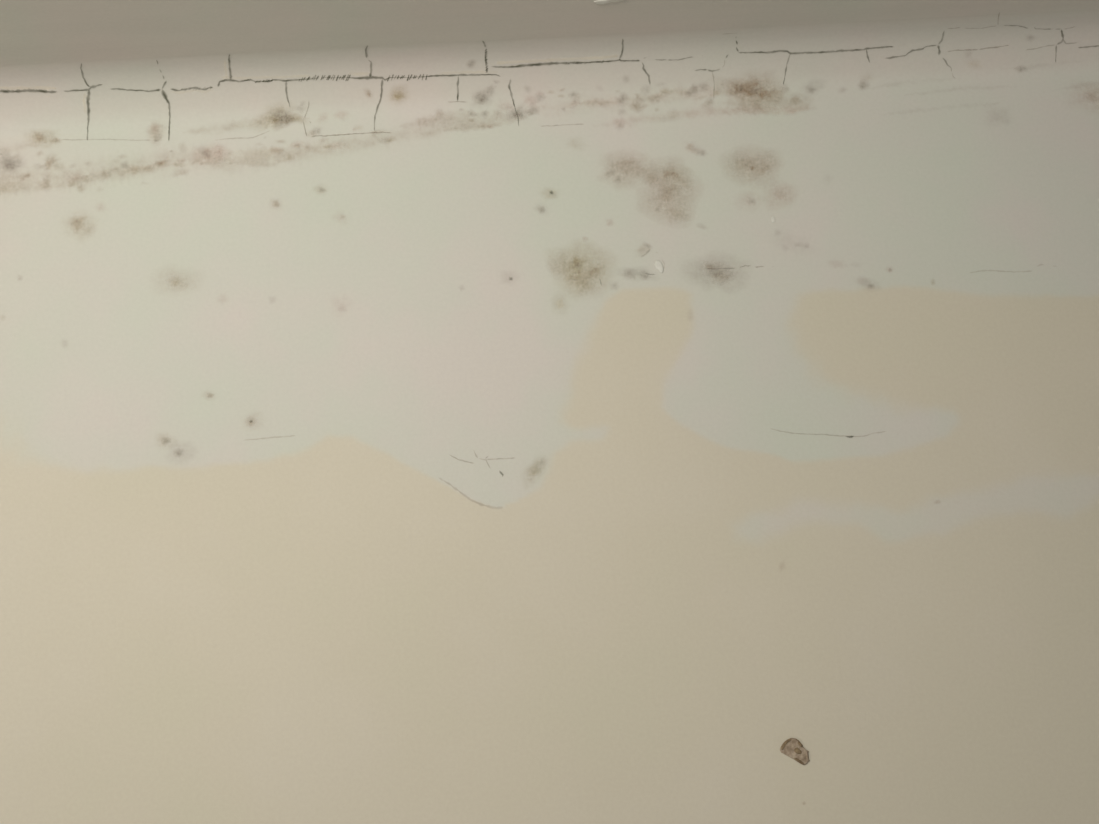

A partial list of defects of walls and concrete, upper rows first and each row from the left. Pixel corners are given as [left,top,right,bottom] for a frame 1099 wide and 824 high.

crack [2,62,184,133]
crack [210,50,458,133]
crack [481,42,646,104]